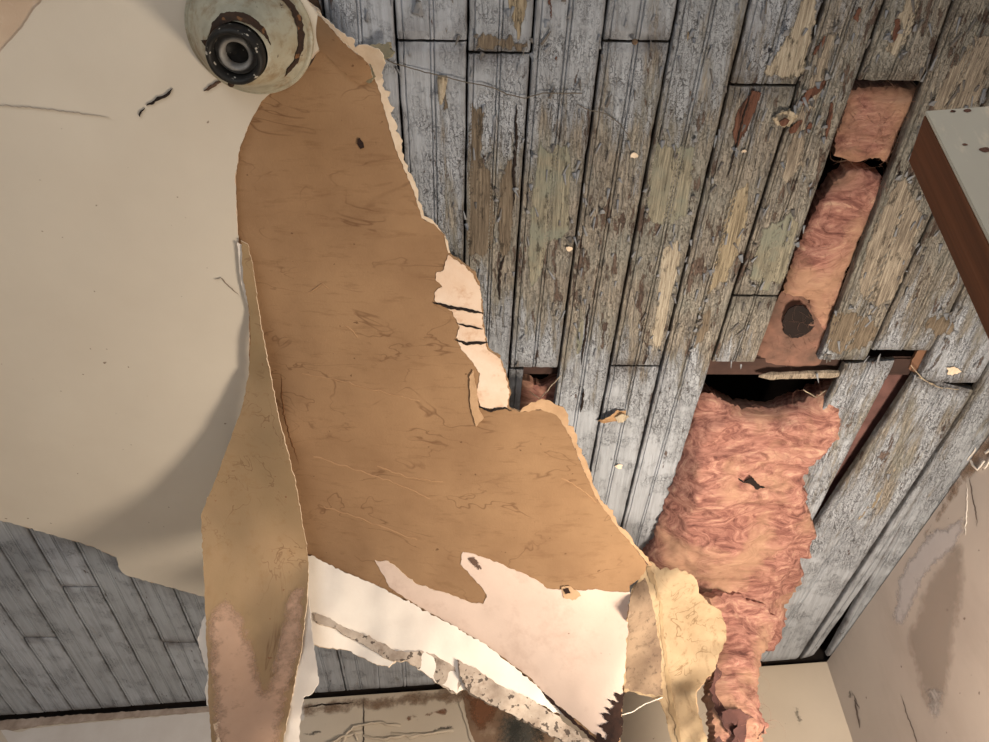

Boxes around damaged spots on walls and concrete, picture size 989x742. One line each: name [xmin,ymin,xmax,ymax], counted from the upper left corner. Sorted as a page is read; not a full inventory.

crack [0,105,104,117]
crack [139,88,173,116]
corrosion [201,11,271,46]
corrosion [282,0,305,76]
peeling [731,90,773,157]
peeling [753,0,876,197]
peeling [863,0,942,82]
peeling [928,17,989,112]
spalling [434,103,619,426]
peeling [618,127,805,365]
peeling [823,154,931,363]
peeling [923,272,967,361]